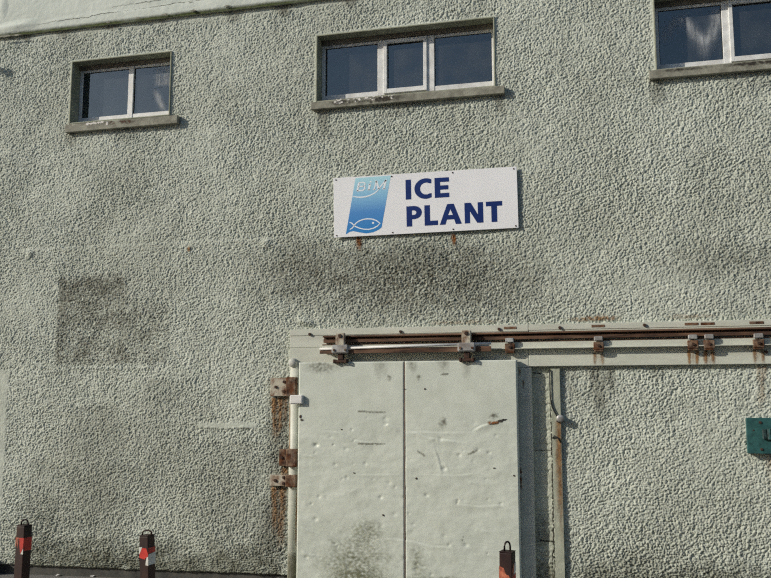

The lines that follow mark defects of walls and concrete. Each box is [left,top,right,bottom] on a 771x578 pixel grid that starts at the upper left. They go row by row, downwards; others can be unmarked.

damp [57,278,130,359]